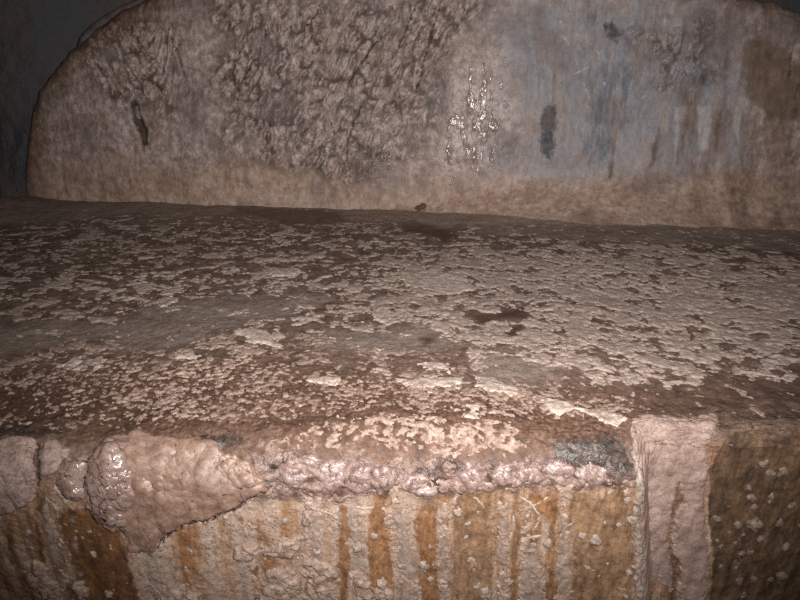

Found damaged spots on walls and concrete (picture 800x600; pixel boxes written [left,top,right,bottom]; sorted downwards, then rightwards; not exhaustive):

water stain [443,63,507,181]
water stain [541,106,556,158]
water stain [697,105,718,152]
peeling [0,207,800,600]
corrosion [59,508,139,600]
corrosion [367,509,395,599]
corrosion [414,509,439,600]
corrosion [451,495,493,600]
corrosion [571,492,634,600]
water stain [552,410,768,600]
corrosion [708,429,800,600]
water stain [758,460,789,478]